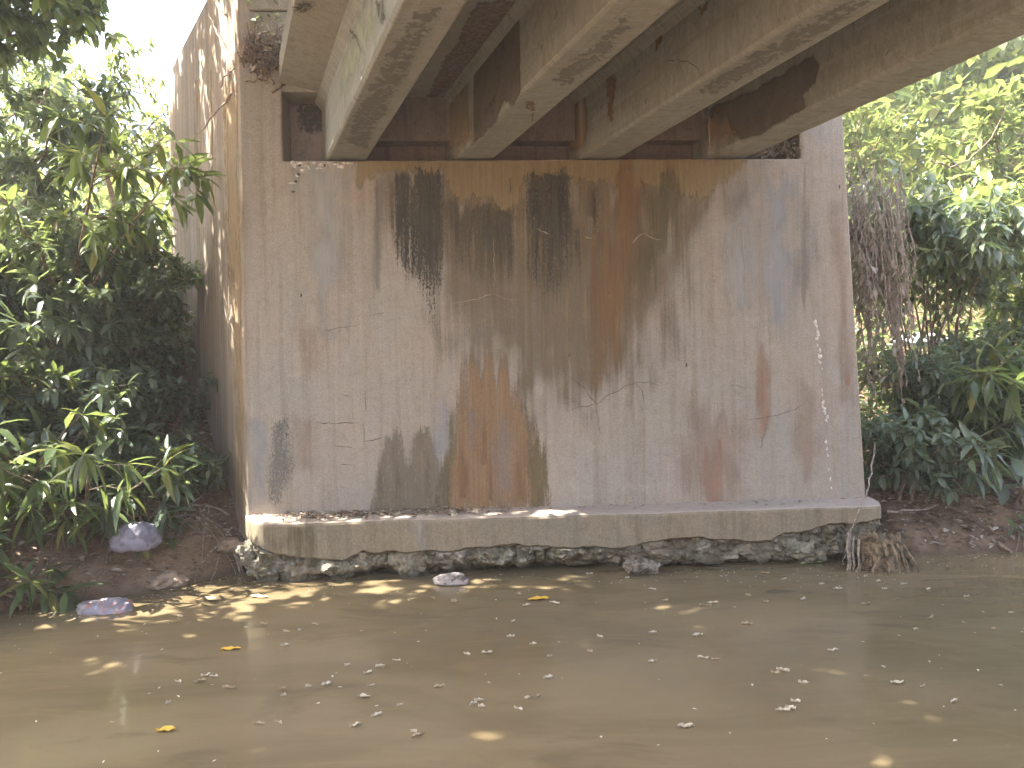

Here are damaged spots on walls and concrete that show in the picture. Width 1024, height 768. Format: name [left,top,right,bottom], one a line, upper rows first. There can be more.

water stain [357,20,747,511]
corrosion [436,352,549,509]
spalling [235,519,880,583]